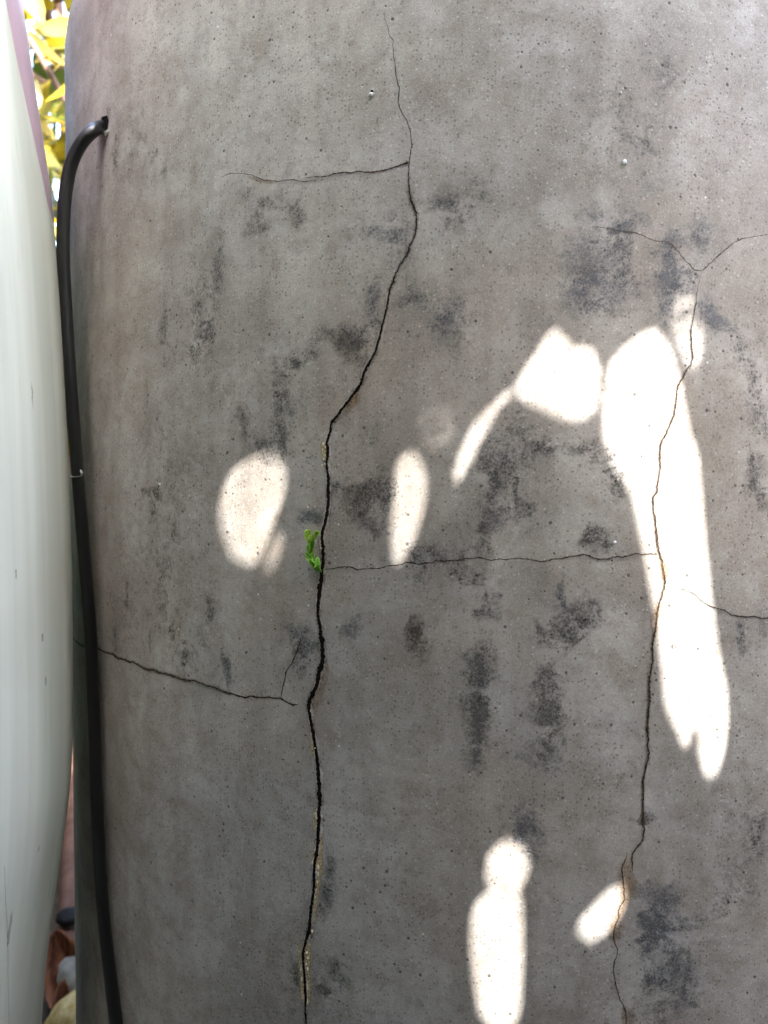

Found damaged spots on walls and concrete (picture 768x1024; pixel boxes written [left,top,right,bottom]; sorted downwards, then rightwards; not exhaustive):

crack [222,15,768,1024]
crack [98,640,301,706]
leakage [463,646,494,769]